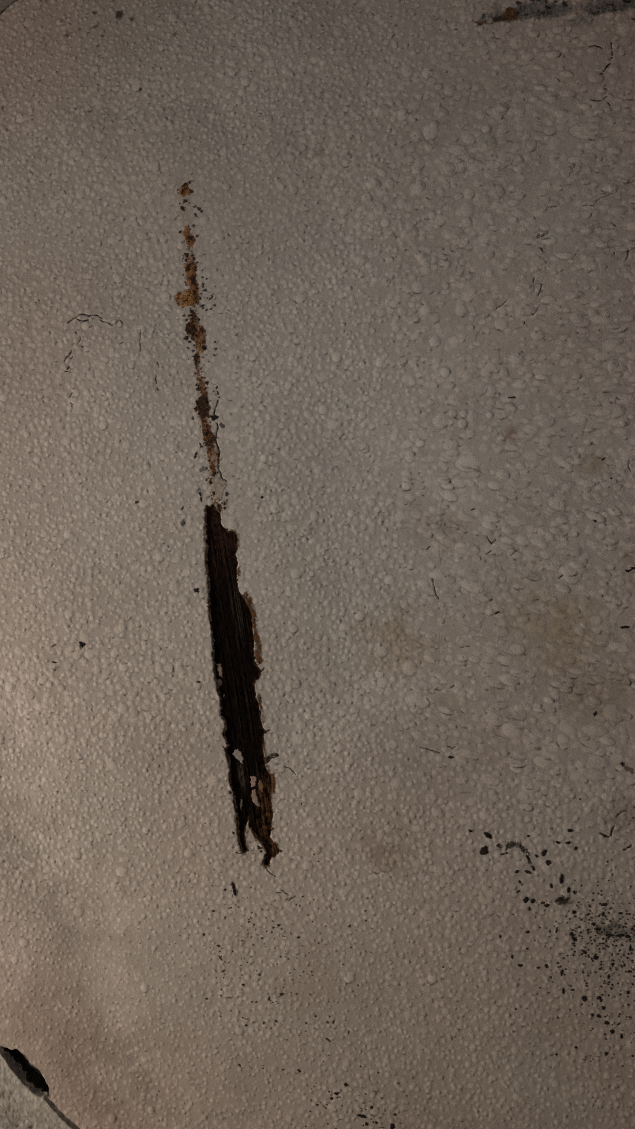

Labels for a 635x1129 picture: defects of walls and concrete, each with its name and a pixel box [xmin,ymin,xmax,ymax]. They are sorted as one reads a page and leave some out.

corrosion [177,181,196,211]
corrosion [174,224,296,877]
spalling [0,1046,80,1129]